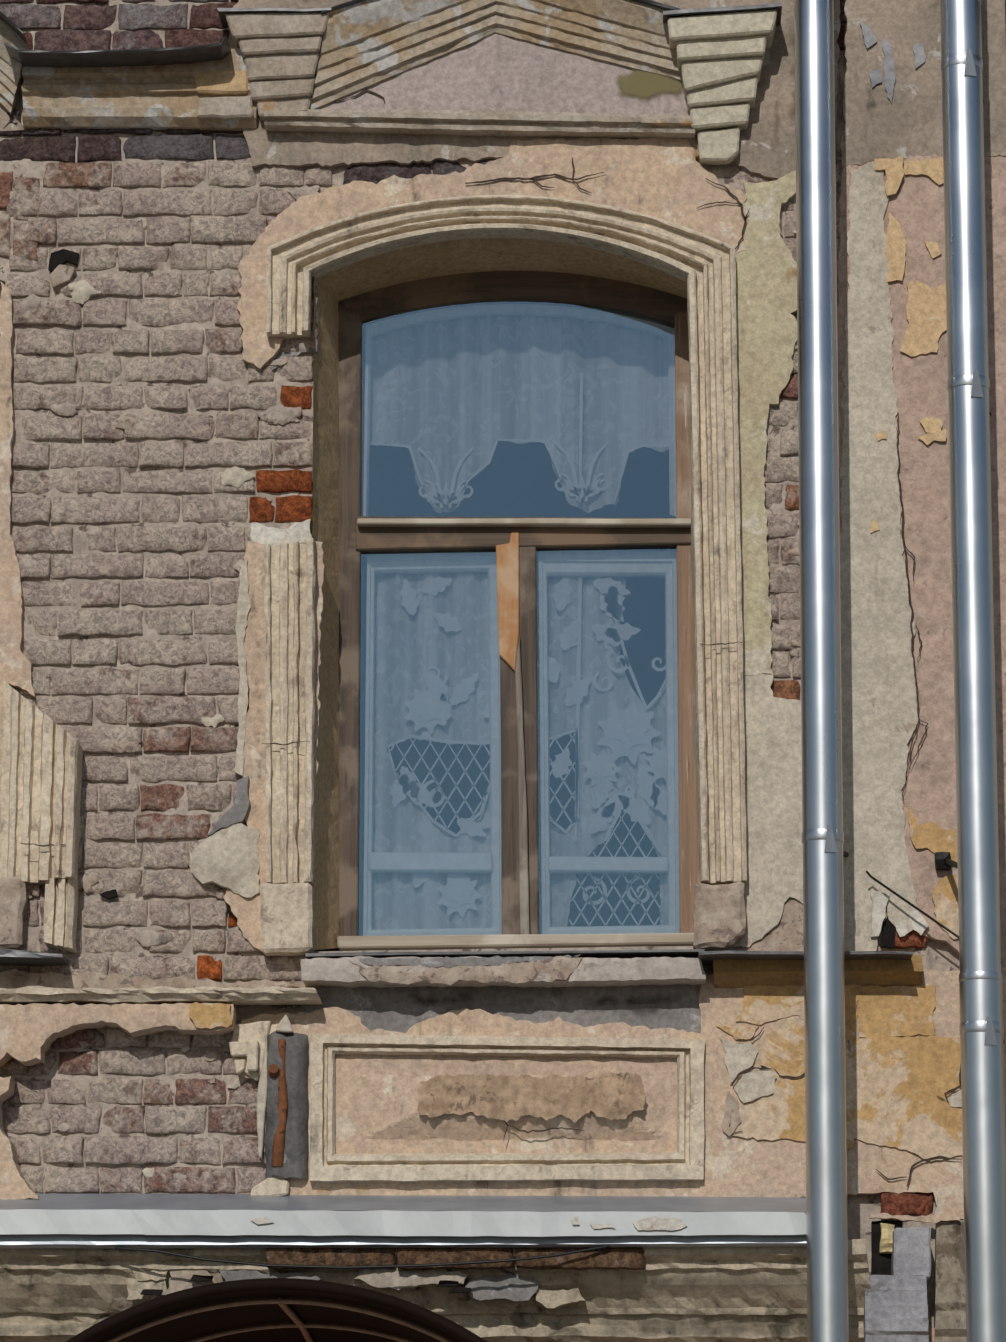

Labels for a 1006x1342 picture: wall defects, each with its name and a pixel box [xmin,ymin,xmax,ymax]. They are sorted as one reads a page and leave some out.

crack [465,157,604,193]
crack [696,178,750,250]
spalling [729,163,775,195]
spalling [779,197,797,262]
peeling [874,156,944,196]
peeling [886,212,947,357]
spalling [0,110,489,981]
spalling [764,343,801,700]
crack [896,412,928,800]
spalling [0,1003,266,1210]
peeling [717,986,805,1142]
peeling [845,985,963,1162]